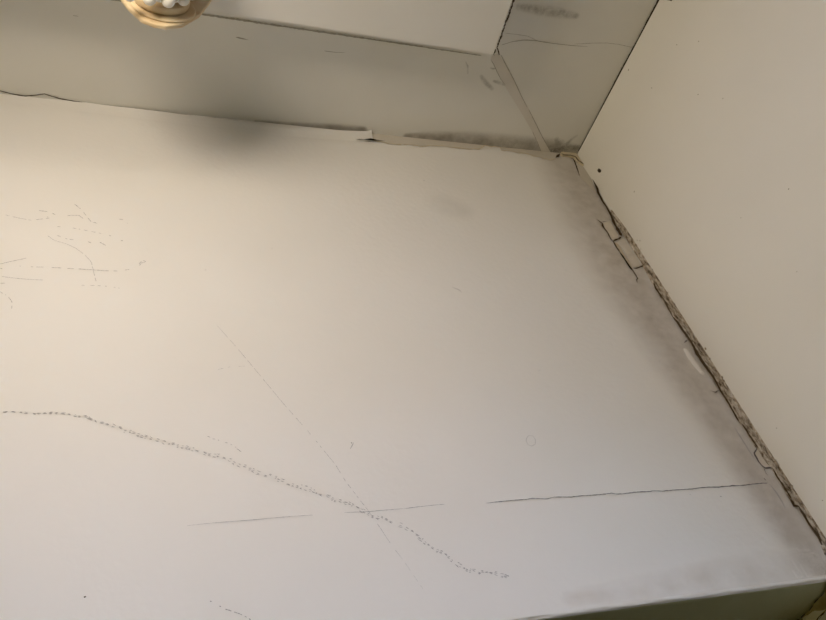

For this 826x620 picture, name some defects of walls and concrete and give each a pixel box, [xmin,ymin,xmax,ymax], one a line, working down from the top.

peeling [0,91,597,194]
crack [573,180,826,554]